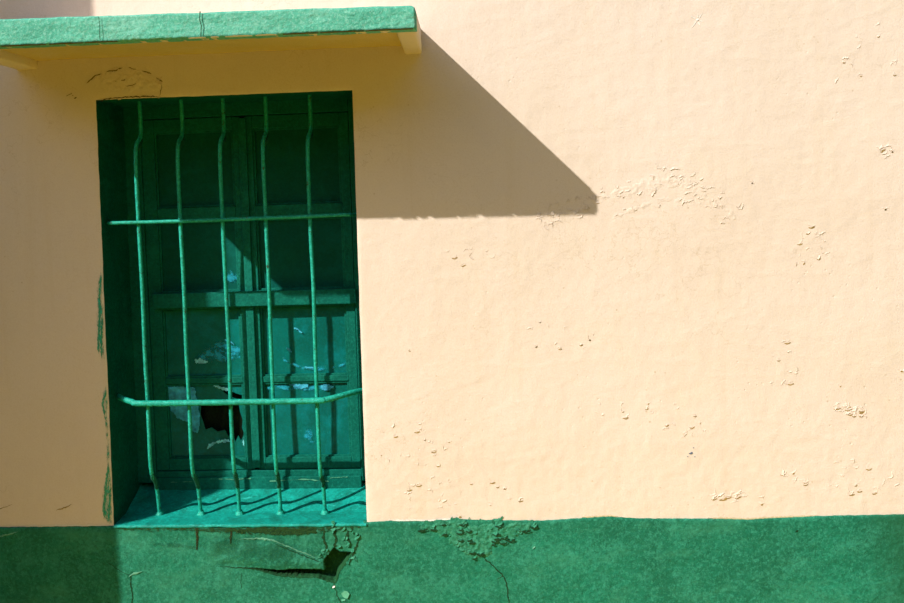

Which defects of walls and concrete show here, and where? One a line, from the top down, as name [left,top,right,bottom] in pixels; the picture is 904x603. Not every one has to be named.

spalling [392,423,538,560]
spalling [252,521,360,601]